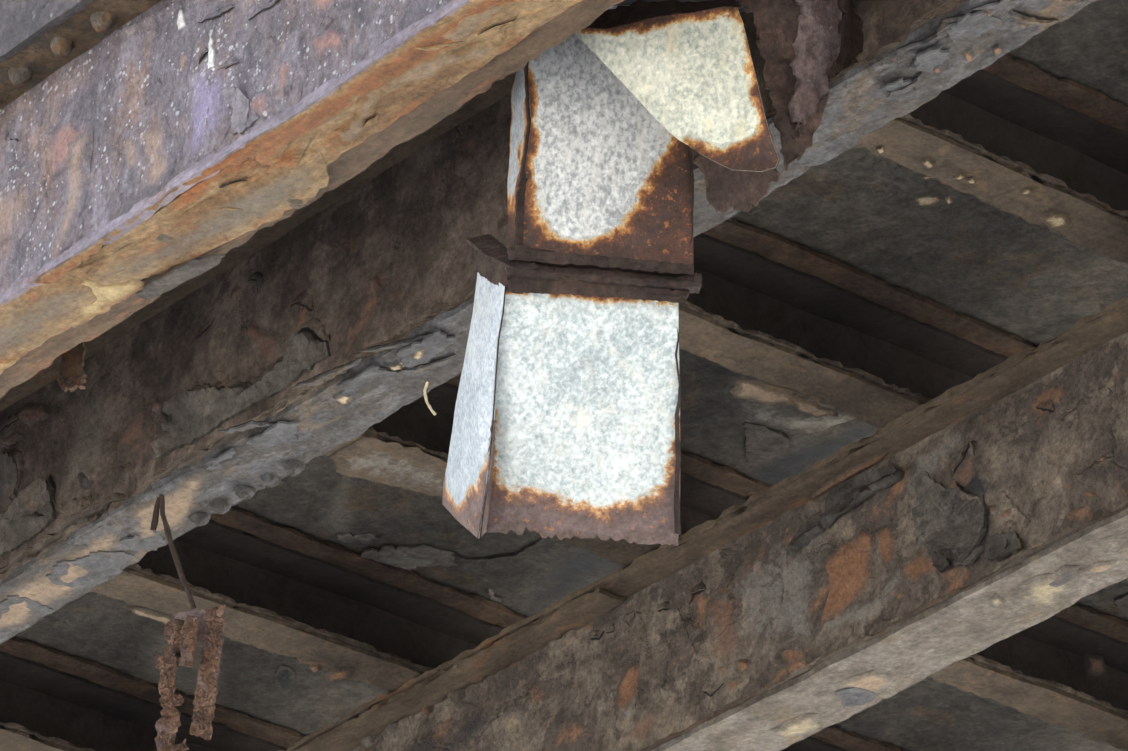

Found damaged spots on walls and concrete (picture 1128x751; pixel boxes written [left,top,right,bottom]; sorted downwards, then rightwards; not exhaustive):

peeling [880,43,949,99]
rust [32,0,523,328]
rust [507,6,779,273]
rust [0,166,46,260]
rust [730,378,839,418]
peeling [203,447,236,470]
rust [442,403,681,547]
spalling [963,437,1003,504]
rust [820,516,943,630]
rust [169,738,189,751]